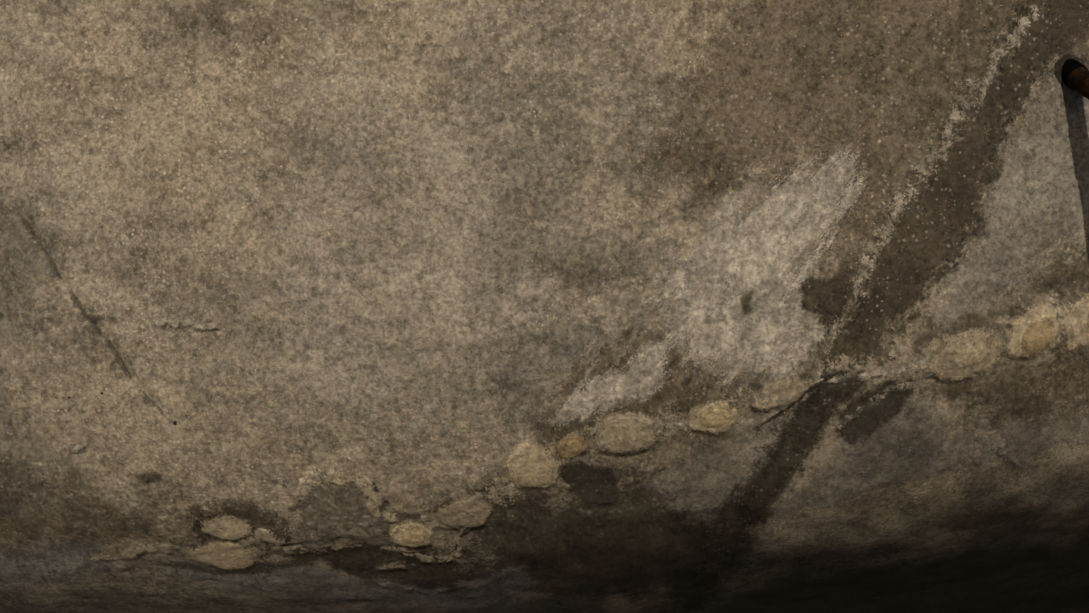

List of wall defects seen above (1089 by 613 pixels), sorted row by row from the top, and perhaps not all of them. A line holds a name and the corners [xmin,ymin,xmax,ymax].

leakage [535,205,649,298]
leakage [0,468,165,613]